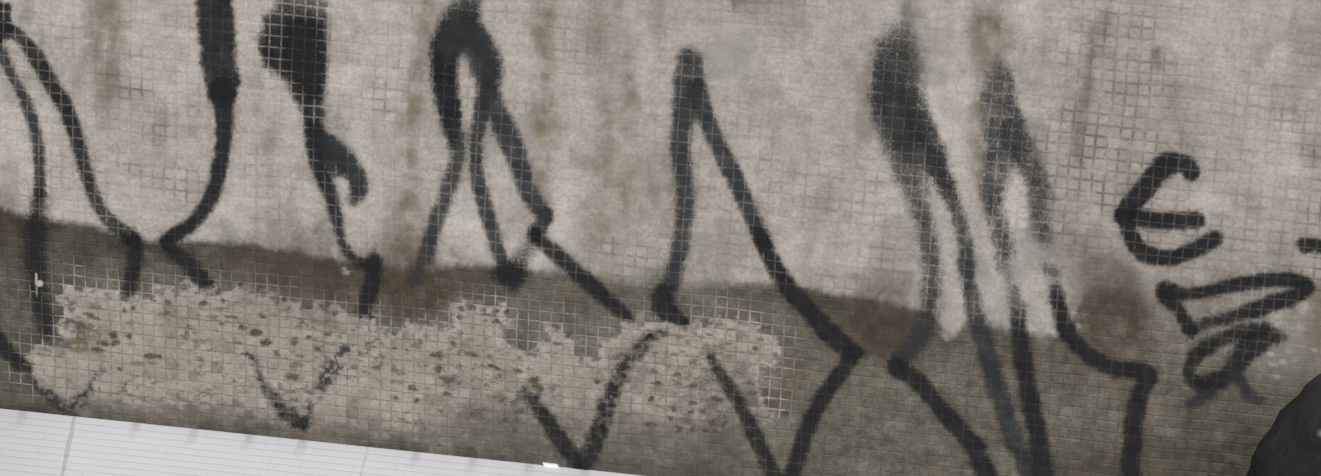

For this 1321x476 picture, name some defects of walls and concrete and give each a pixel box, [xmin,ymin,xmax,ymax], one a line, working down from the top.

peeling [8,265,796,448]